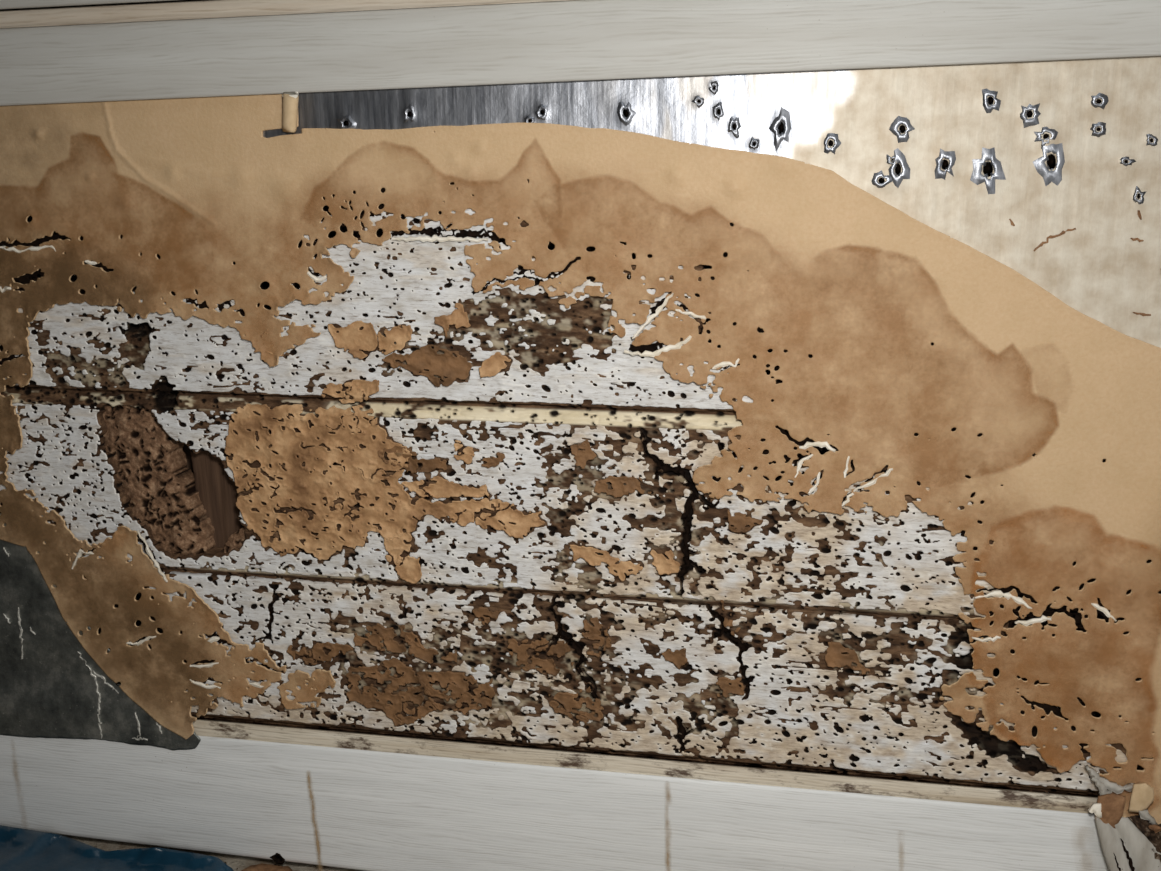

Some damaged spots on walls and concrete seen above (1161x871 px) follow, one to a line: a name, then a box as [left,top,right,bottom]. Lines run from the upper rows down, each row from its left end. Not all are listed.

water stain [82,134,126,187]
water stain [0,250,98,336]
peeling [5,209,753,409]
water stain [986,346,1057,463]
water stain [106,579,206,706]
peeling [0,403,1127,818]
crack [548,597,599,699]
crack [637,429,750,700]